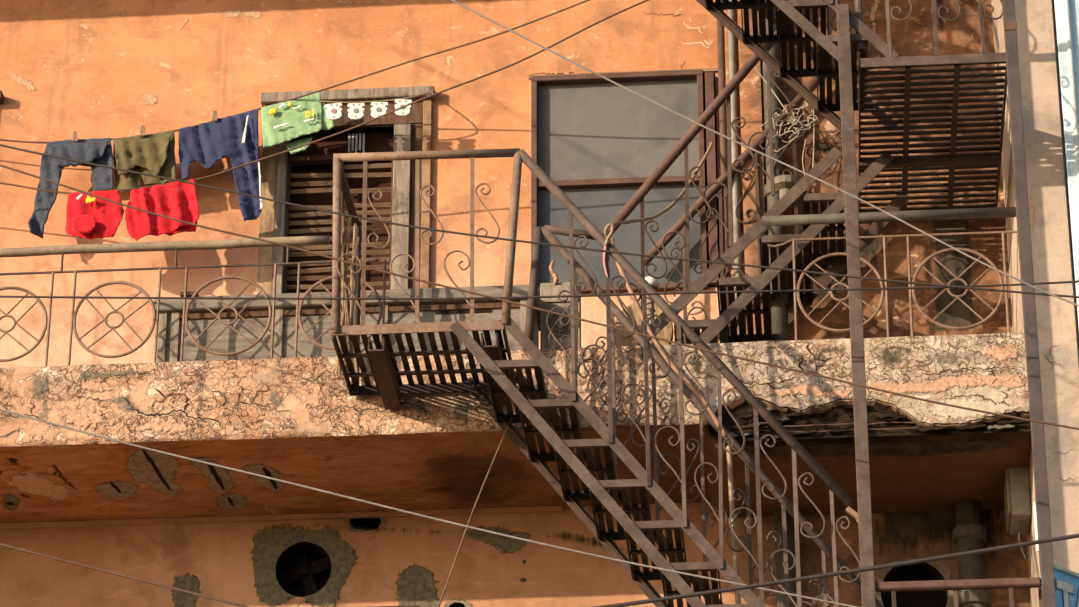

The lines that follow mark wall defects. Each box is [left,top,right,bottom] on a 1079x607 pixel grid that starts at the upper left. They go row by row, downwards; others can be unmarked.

crack [301,370,431,428]
crack [694,342,833,398]
crack [914,366,1021,406]
crack [0,371,292,475]
peeling [3,466,74,510]
crack [51,464,76,489]
water stain [431,457,516,501]